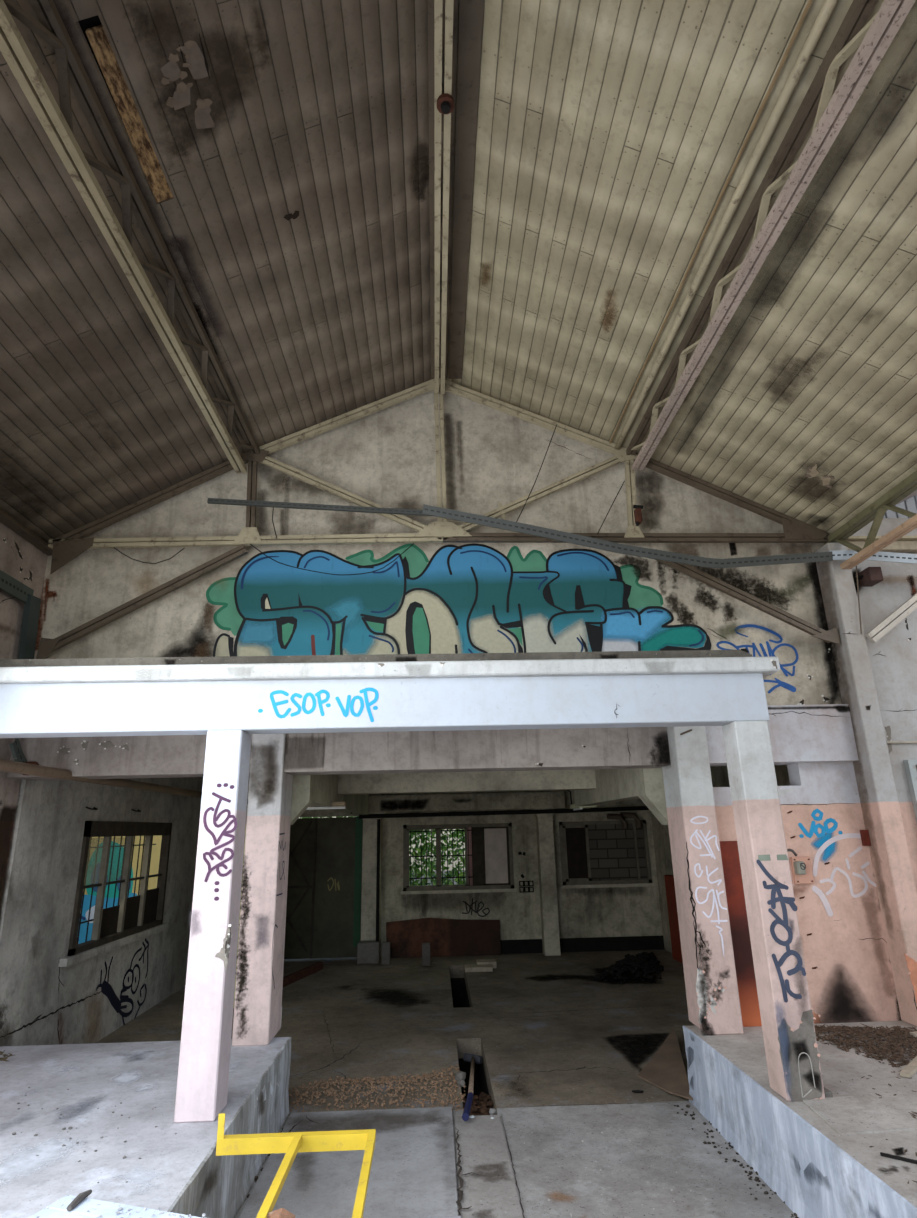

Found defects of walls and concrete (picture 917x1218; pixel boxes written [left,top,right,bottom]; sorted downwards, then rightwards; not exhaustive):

peeling [160,40,214,129]
water stain [141,10,248,150]
water stain [615,555,822,637]
water stain [825,624,850,712]
water stain [237,857,249,1034]
peeling [696,968,726,1024]
crack [455,1127,484,1216]
crack [493,1065,676,1218]